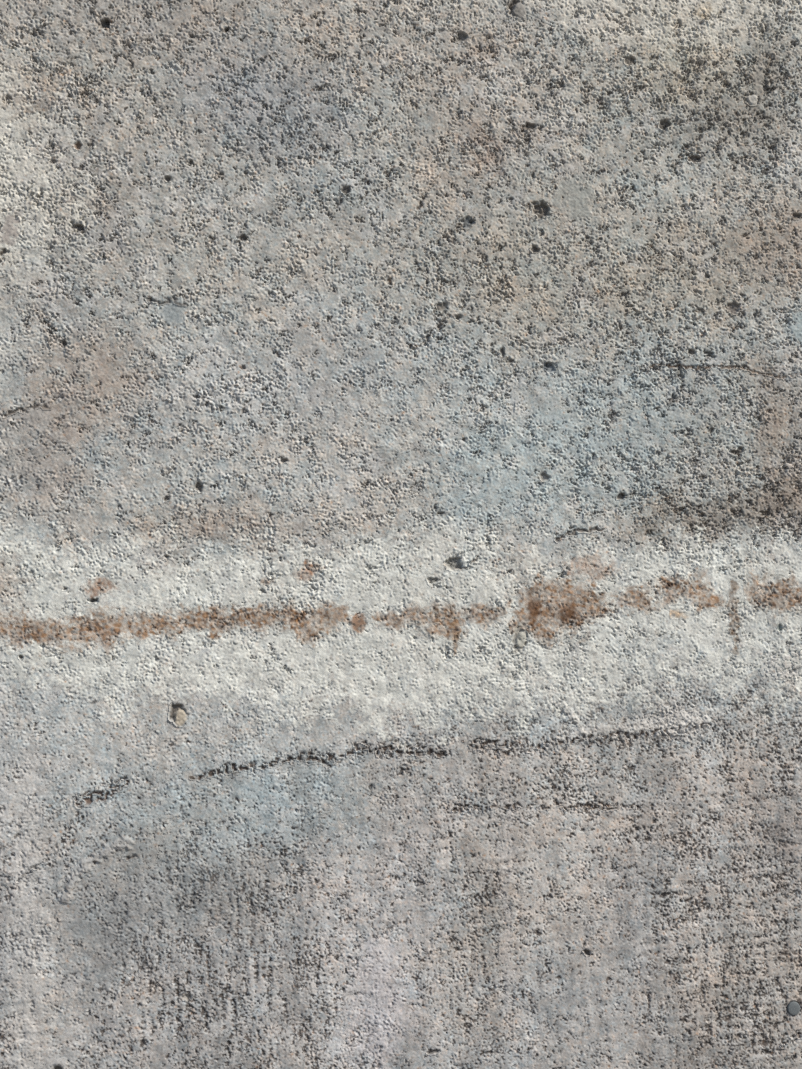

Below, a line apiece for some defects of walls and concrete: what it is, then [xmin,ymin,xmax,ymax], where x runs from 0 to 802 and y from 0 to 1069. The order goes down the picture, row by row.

corrosion [0,548,802,660]
crack [189,722,712,782]
crack [72,777,130,809]